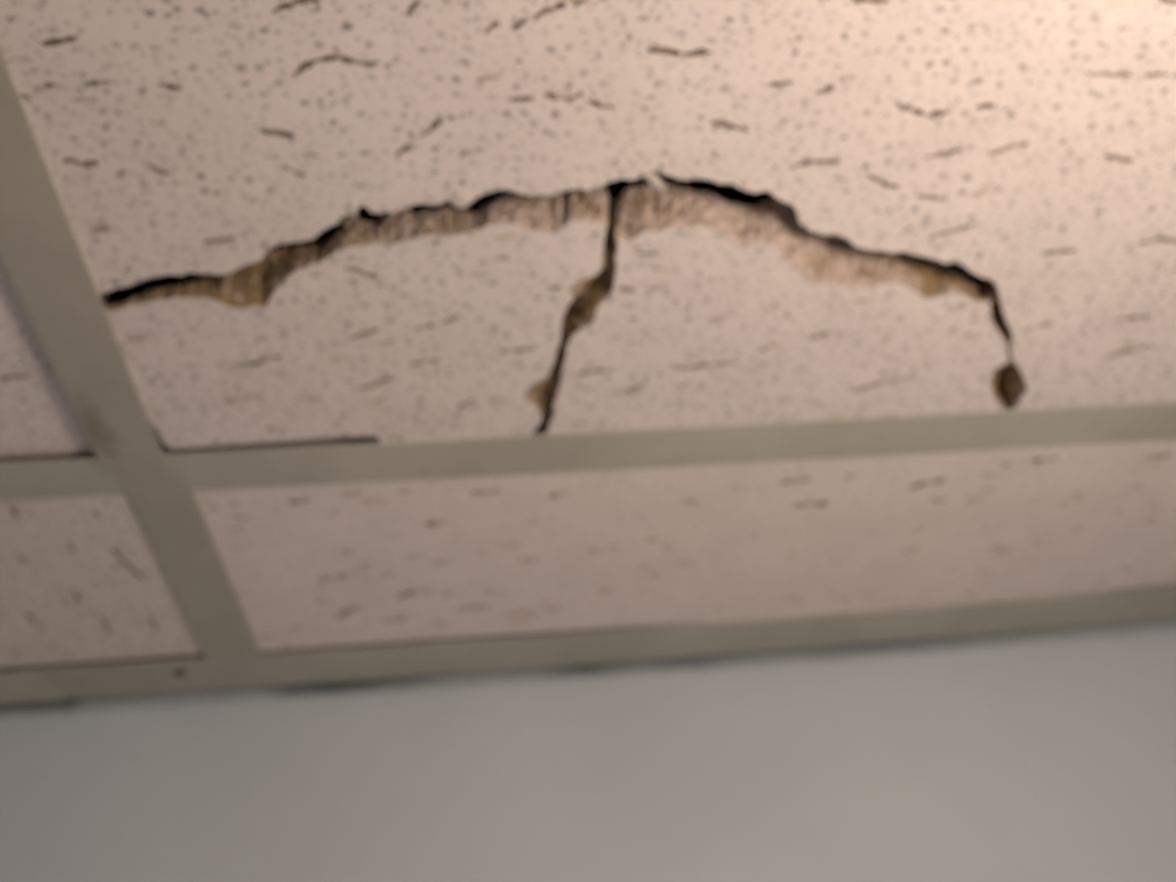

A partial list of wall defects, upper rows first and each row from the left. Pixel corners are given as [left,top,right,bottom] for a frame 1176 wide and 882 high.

crack [104,173,1016,365]
crack [536,311,581,429]